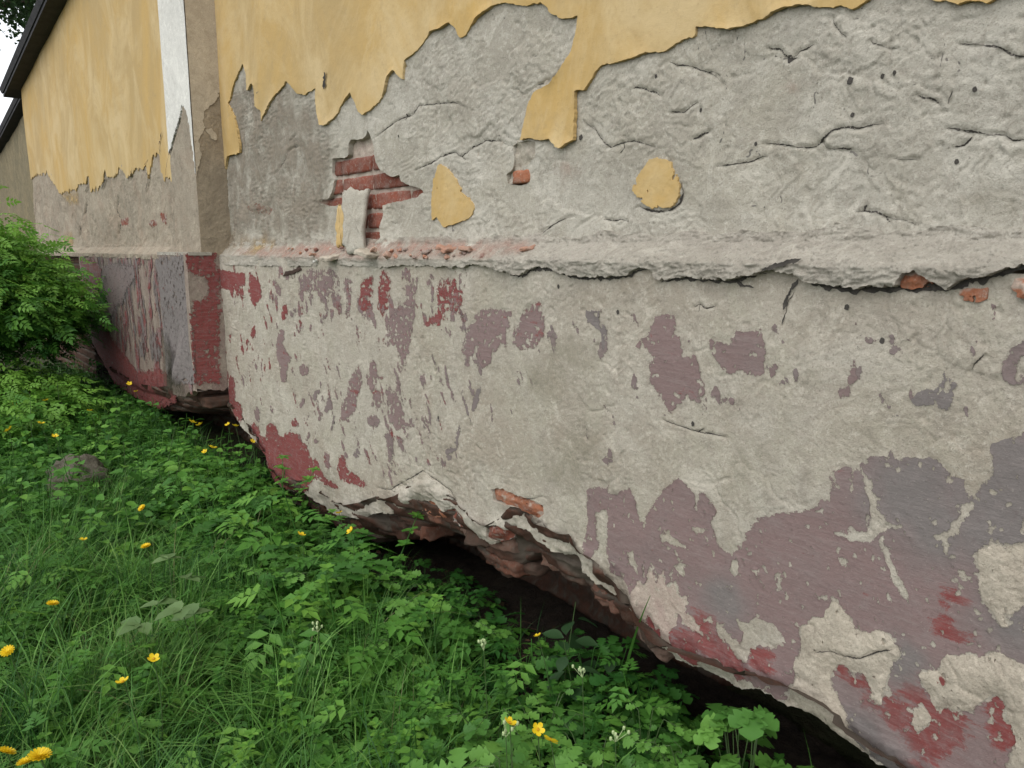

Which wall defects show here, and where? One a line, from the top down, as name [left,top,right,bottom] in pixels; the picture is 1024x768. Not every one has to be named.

crack [380,62,460,130]
crack [635,31,812,113]
crack [898,39,1024,147]
crack [420,121,513,168]
crack [694,83,878,209]
crack [604,186,683,223]
crack [858,194,915,225]
peeling [32,0,1024,492]
crack [504,258,1024,323]
crack [665,420,725,437]
peeling [582,432,1024,768]
crack [817,649,894,659]